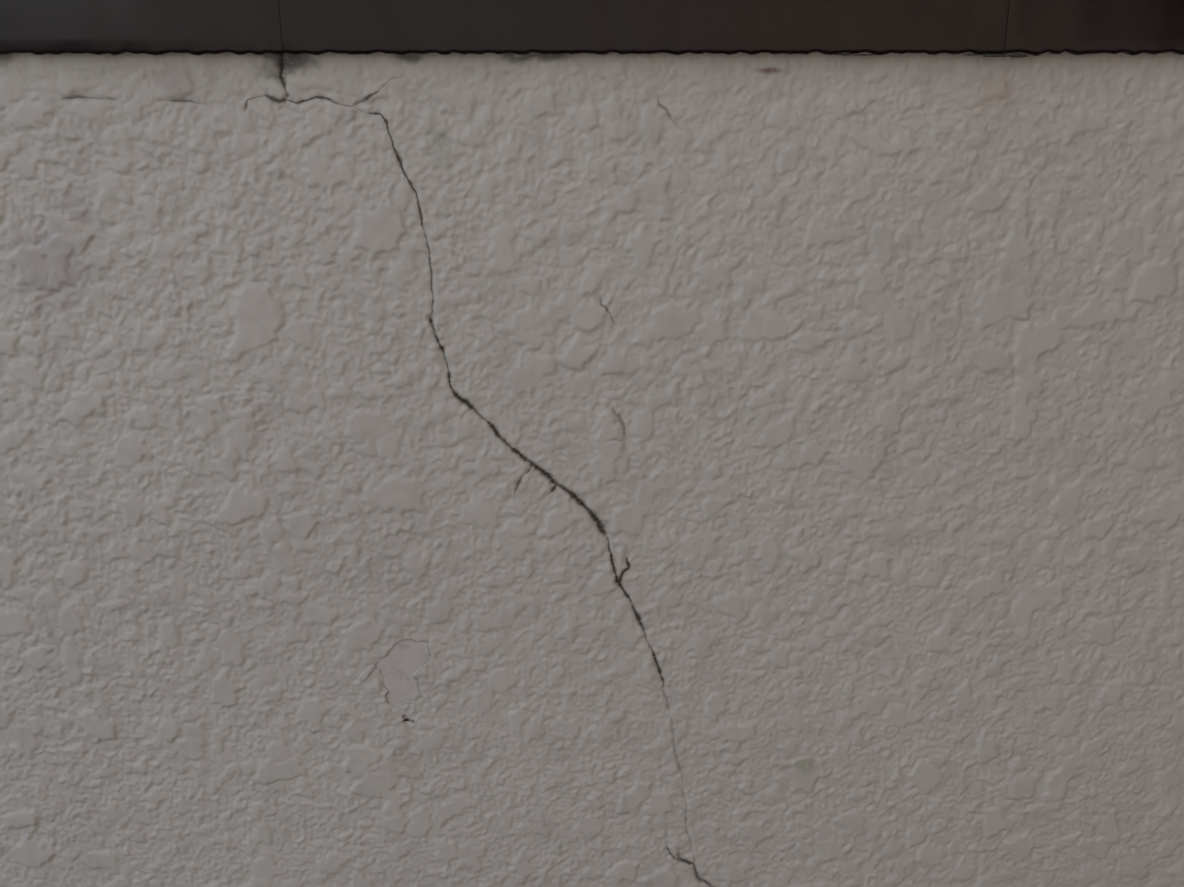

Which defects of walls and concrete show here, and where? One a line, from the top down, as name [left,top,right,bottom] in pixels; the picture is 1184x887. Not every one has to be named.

crack [245,53,664,683]